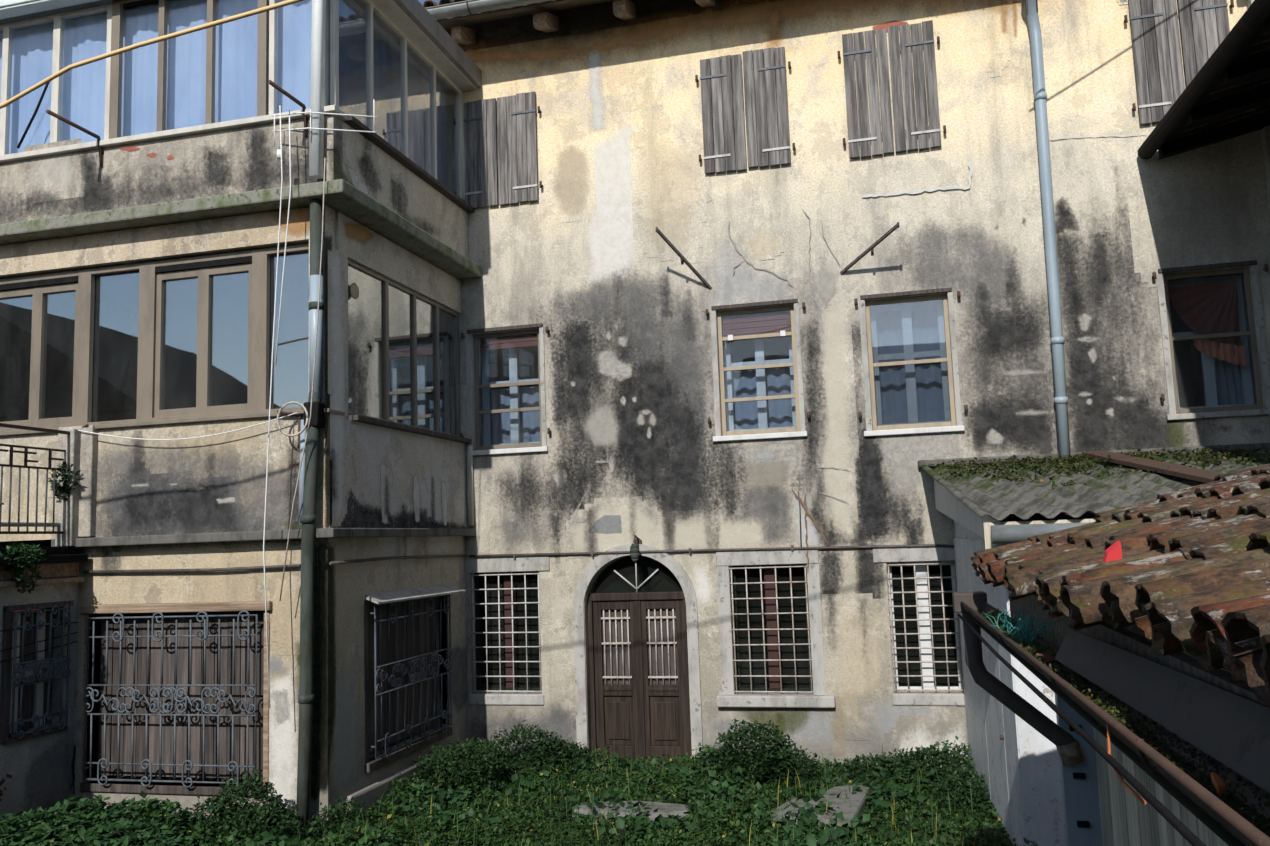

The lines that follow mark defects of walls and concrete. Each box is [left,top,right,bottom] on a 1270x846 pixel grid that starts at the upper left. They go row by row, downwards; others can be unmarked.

mould [0,125,316,221]
leakage [95,436,302,670]
mould [329,137,433,233]
leakage [330,451,467,559]
mould [500,280,787,557]
leakage [802,329,921,740]
leakage [914,226,1053,454]
leakage [1055,142,1270,452]
leakage [316,543,365,799]
leakage [884,710,969,773]